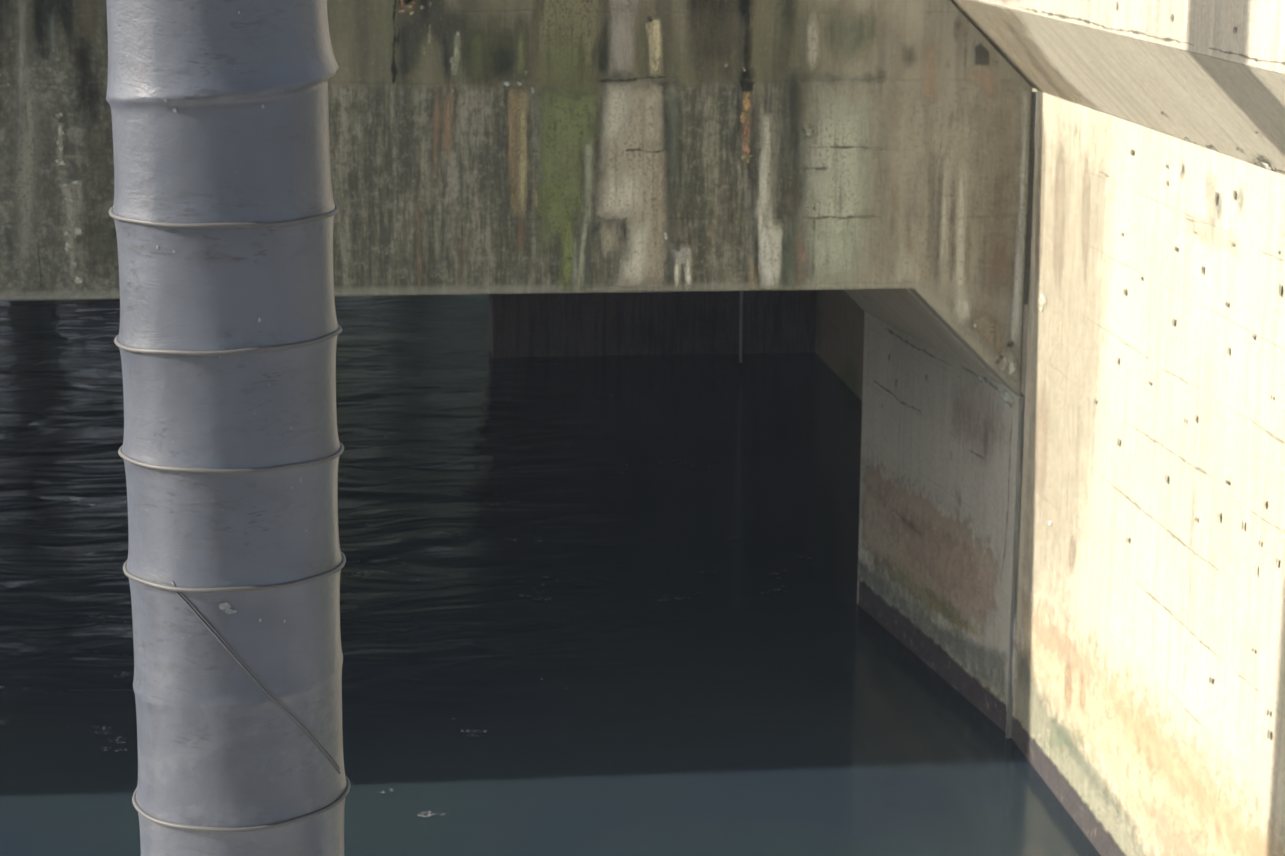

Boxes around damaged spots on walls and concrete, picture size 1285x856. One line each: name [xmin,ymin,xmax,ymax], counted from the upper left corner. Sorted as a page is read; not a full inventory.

damp [0,0,73,59]
damp [8,44,42,289]
damp [88,128,114,210]
damp [89,226,117,263]
damp [563,143,592,286]
damp [858,580,1125,856]